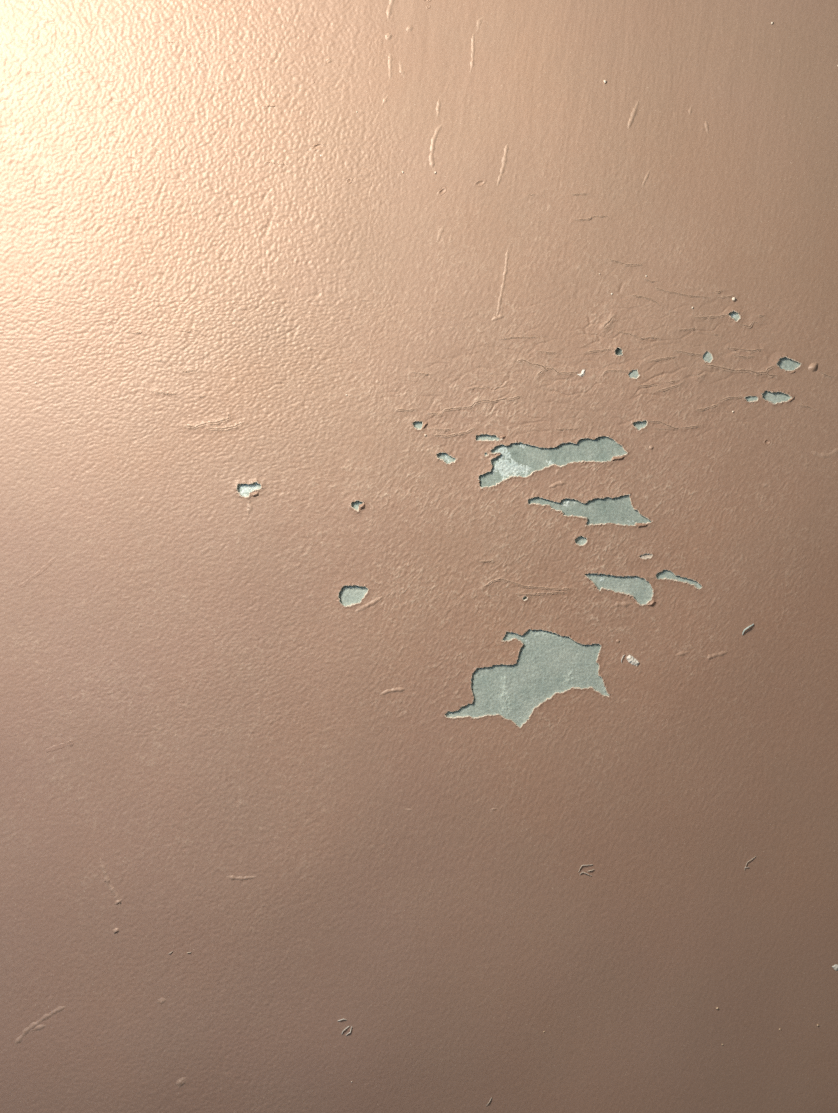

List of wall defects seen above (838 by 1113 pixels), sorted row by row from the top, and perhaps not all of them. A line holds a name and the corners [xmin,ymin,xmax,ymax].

peeling [775,354,804,374]
peeling [742,389,795,406]
peeling [474,431,629,491]
peeling [234,479,264,500]
peeling [526,492,654,548]
peeling [336,583,371,609]
peeling [583,551,705,608]
peeling [442,627,611,730]